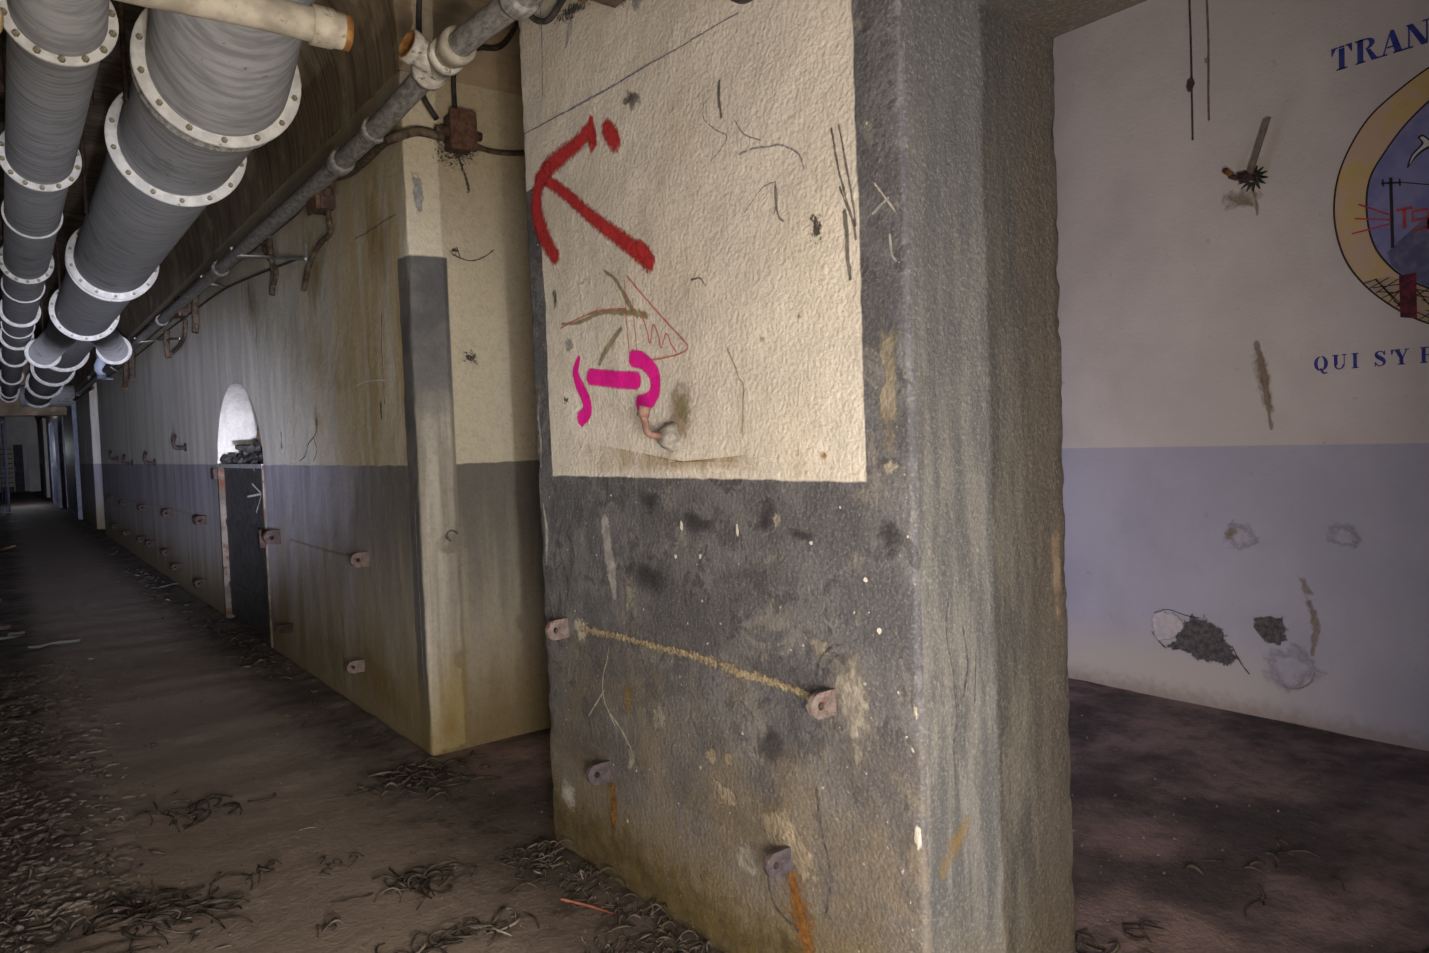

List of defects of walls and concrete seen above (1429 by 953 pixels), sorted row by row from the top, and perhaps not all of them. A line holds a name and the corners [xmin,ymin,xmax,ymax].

peeling [1052,534,1061,616]
spalling [1152,609,1250,675]
spalling [1253,616,1287,645]
corrosion [788,872,814,953]